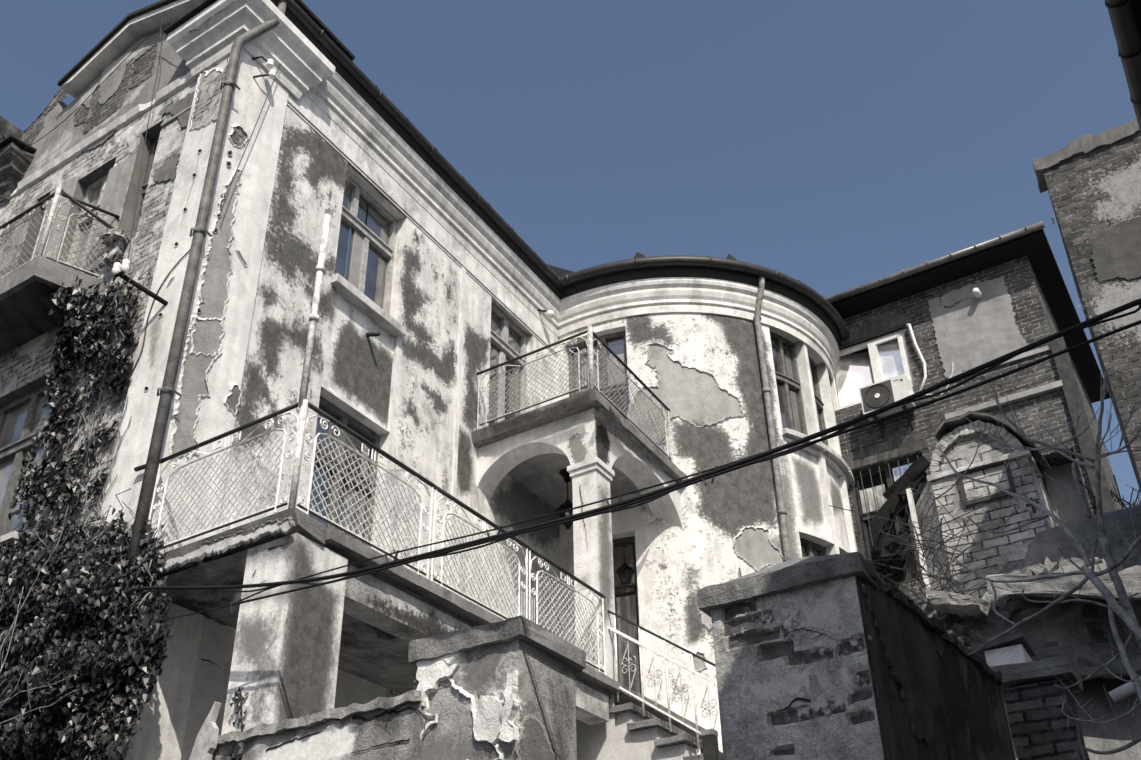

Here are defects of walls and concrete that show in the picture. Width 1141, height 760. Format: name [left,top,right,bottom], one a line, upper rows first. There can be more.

flaking render [19,42,159,174]
flaking render [161,62,229,132]
flaking render [1090,216,1141,283]
flaking render [623,314,785,637]
flaking render [416,651,559,760]
peeling [682,578,879,726]
flaking render [773,747,795,756]